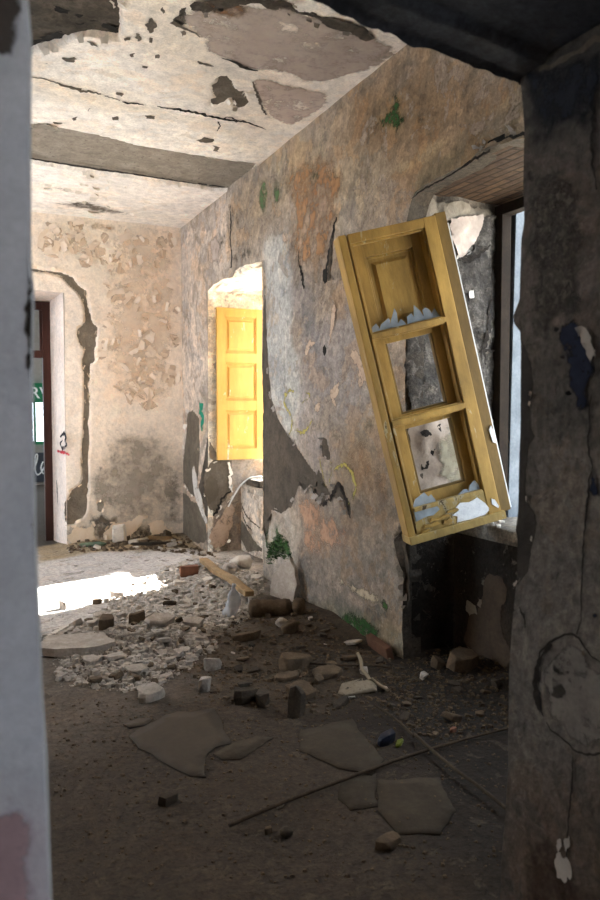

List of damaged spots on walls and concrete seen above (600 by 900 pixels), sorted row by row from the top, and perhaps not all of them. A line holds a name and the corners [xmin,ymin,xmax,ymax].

flaking render [161,0,375,41]
crack [32,77,264,131]
flaking render [209,76,249,111]
crack [411,149,490,199]
flaking render [31,117,257,410]
water stain [94,439,179,514]
flaking render [68,286,351,552]
peeling [408,418,461,490]
flaking render [421,198,537,668]
water stain [93,515,117,539]
crack [532,395,600,857]
peeling [554,837,572,883]